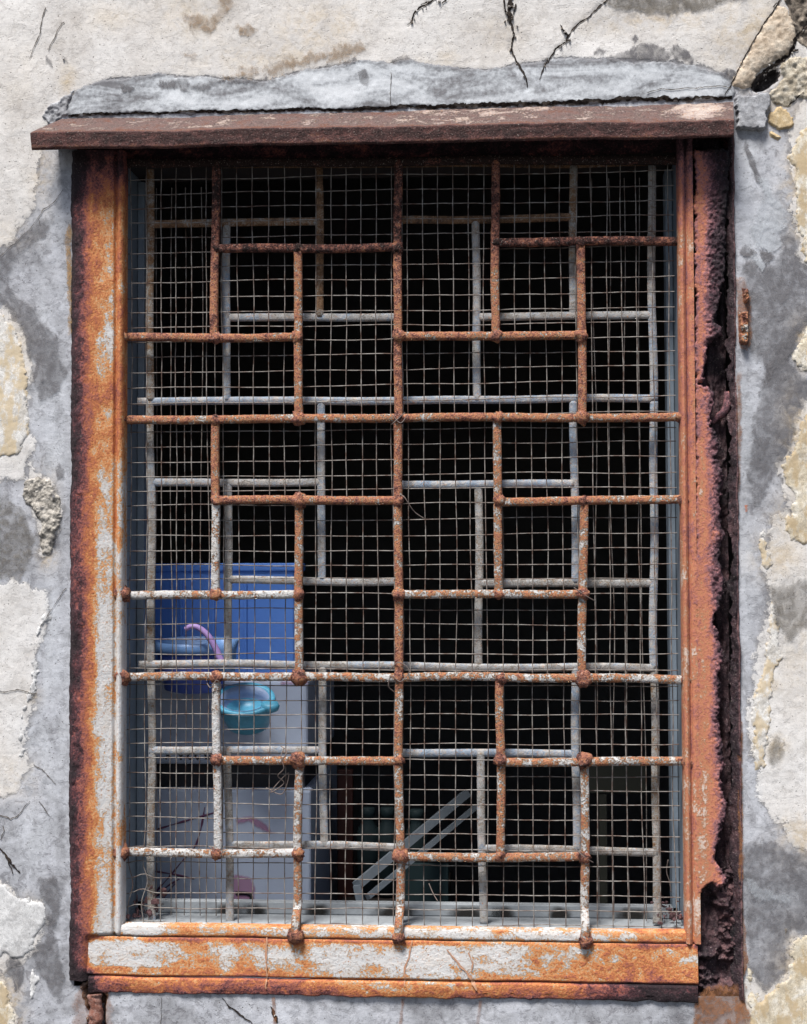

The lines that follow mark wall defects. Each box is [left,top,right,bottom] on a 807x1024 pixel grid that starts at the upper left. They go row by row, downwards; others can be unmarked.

damp [184,0,230,32]
damp [159,44,368,91]
crack [68,0,807,117]
flaking render [752,0,807,263]
corrosion [692,138,723,276]
flaking render [0,313,30,456]
damp [0,220,67,399]
damp [740,143,807,503]
spalling [23,477,63,556]
corrosion [695,272,752,892]
flaking render [781,415,807,545]
corrosion [694,890,751,1024]